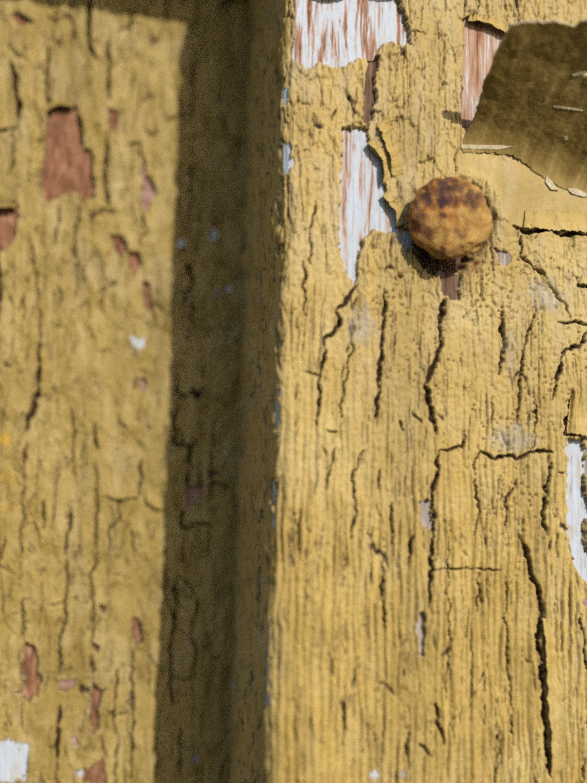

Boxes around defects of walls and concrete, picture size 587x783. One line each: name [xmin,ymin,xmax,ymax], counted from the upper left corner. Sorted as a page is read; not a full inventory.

peeling [41,99,99,202]
peeling [460,13,587,197]
peeling [0,201,19,252]
crack [515,228,584,238]
peeling [523,210,587,233]
crack [0,208,80,558]
crack [306,286,356,433]
crack [373,290,386,418]
crack [399,302,442,430]
crack [554,322,587,378]
crack [481,450,547,460]
peeling [19,633,43,699]